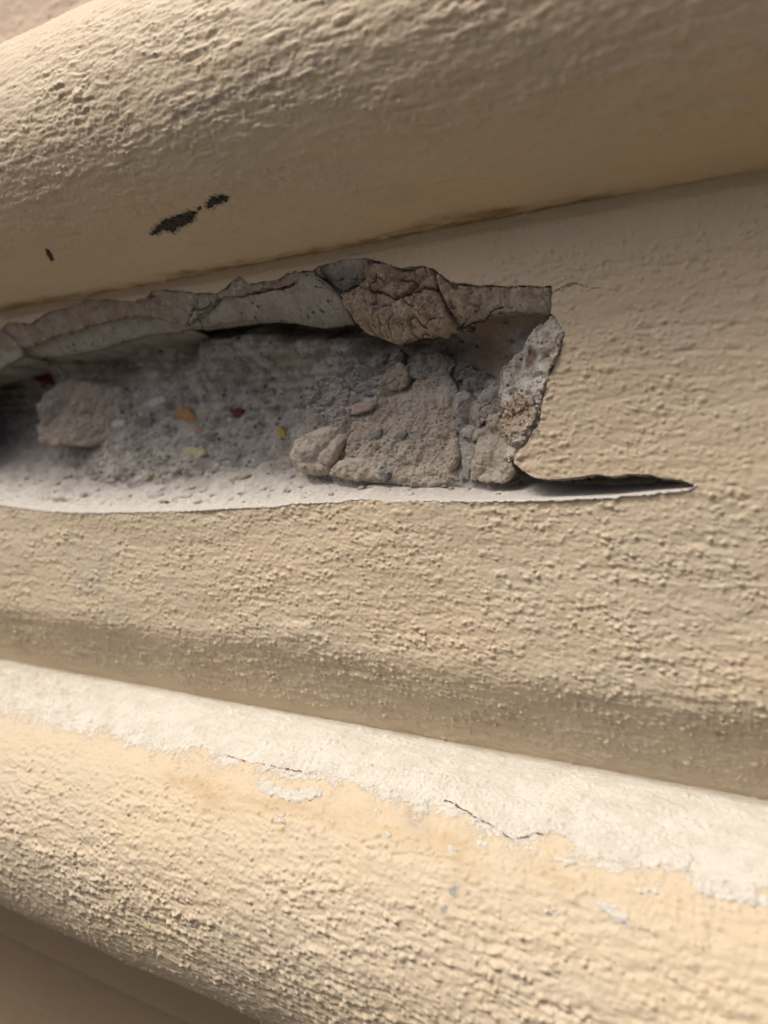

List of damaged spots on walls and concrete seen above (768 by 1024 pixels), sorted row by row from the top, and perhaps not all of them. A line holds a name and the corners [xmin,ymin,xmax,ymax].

spalling [0,258,697,514]
peeling [257,778,325,824]
crack [444,799,546,840]
peeling [684,875,768,907]